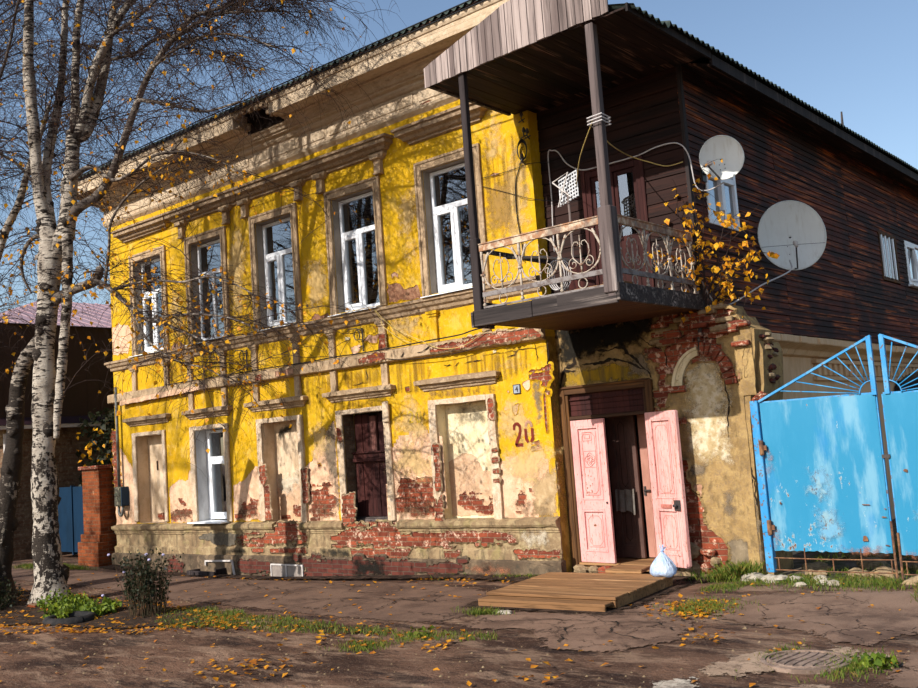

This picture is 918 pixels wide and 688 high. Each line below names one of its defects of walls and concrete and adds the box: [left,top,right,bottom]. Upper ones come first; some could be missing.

flaking render [386,271,422,304]
crack [445,322,726,387]
crack [723,380,731,437]
peeling [386,353,642,522]
peeling [277,420,341,521]
flaking render [692,482,704,497]
peeling [808,469,830,499]
peeling [816,510,842,538]